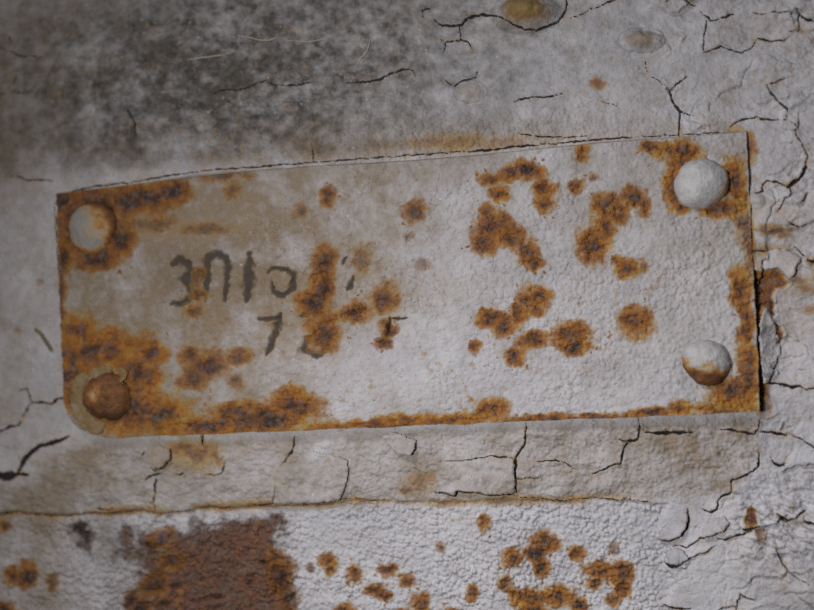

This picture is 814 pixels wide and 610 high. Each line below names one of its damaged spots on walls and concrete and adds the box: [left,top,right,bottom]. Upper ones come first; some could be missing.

crack [422,0,615,52]
crack [665,0,814,53]
crack [71,61,814,263]
corrosion [56,128,788,467]
crack [766,382,814,390]
crack [0,507,121,516]
crack [141,448,275,514]
crack [303,497,385,505]
crack [434,417,694,502]
crack [661,420,814,569]
spalling [746,508,757,527]
crack [775,547,809,585]